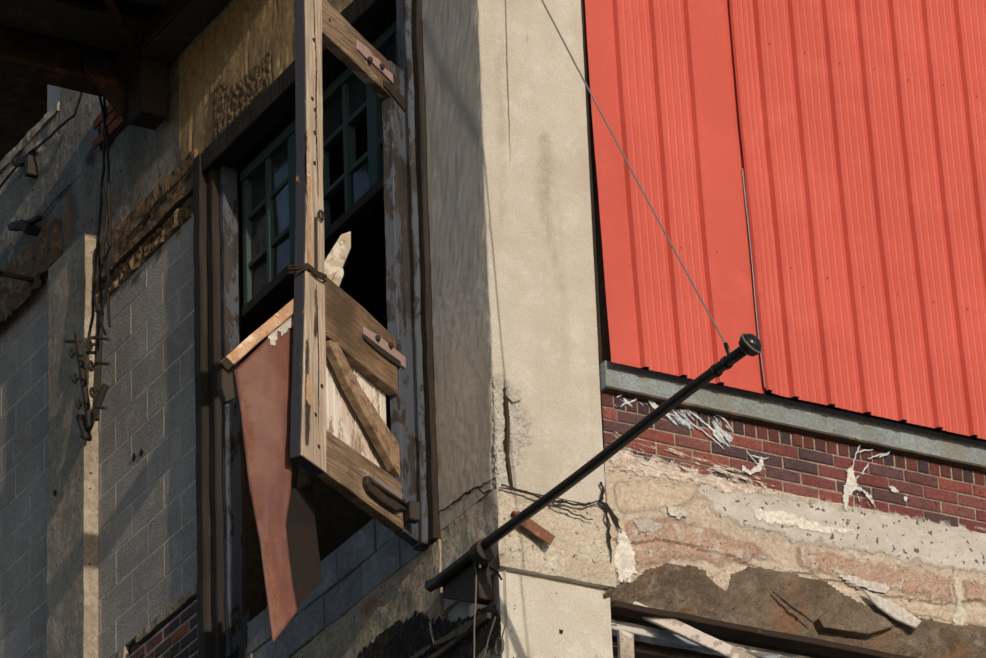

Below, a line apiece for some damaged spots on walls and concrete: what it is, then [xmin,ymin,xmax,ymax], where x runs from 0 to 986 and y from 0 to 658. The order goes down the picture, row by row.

spalling [491,375,534,489]
crack [438,477,622,561]
spalling [604,505,986,658]